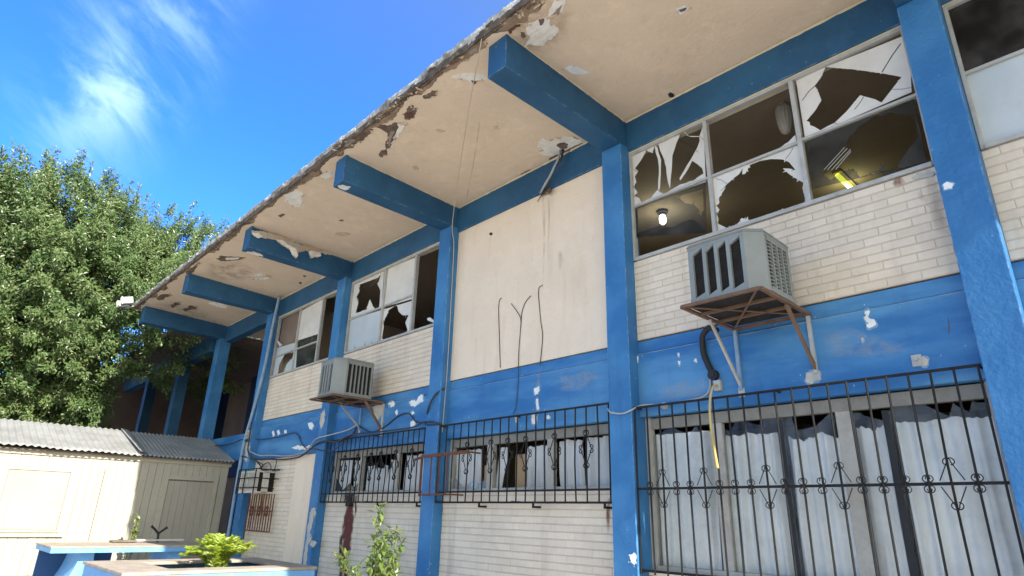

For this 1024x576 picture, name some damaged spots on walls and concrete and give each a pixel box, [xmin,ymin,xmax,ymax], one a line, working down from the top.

spalling [136,0,566,313]
peeling [538,136,584,157]
peeling [858,307,878,343]
peeling [800,369,822,385]
peeling [373,394,425,429]
peeling [515,385,551,426]
corrosion [339,494,356,576]